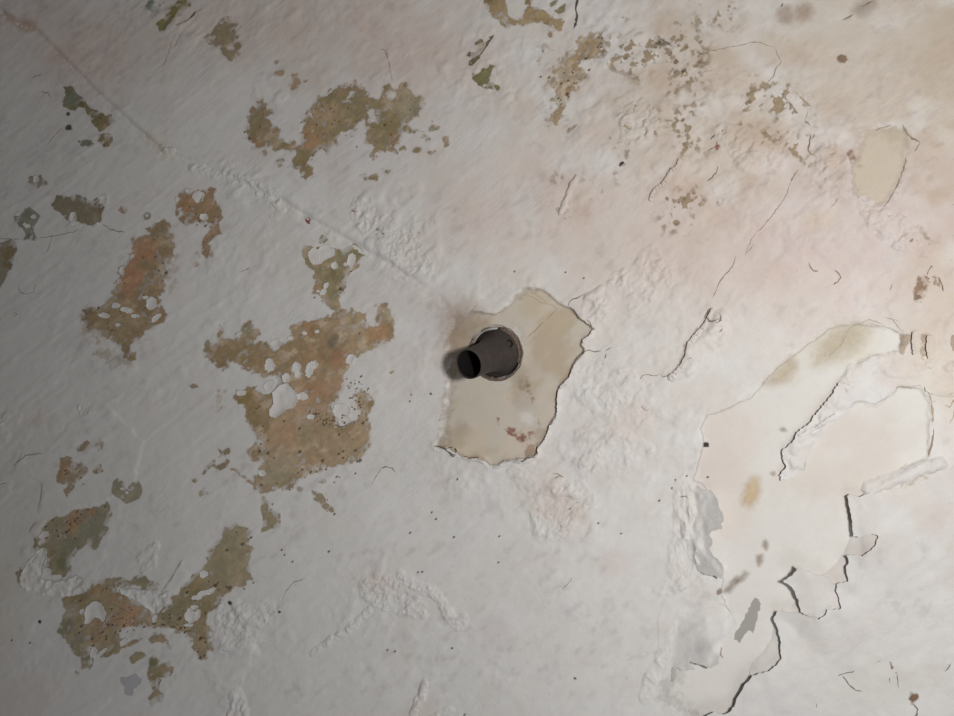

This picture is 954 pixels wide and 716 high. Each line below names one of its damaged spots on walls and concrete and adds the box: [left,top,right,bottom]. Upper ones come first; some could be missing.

peeling [63,86,113,147]
peeling [244,80,449,179]
peeling [467,36,500,90]
peeling [484,0,566,38]
peeling [540,32,605,125]
peeling [0,207,40,286]
peeling [52,194,108,229]
peeling [81,187,223,364]
peeling [438,288,595,469]
peeling [16,235,394,700]
peeling [656,324,954,716]